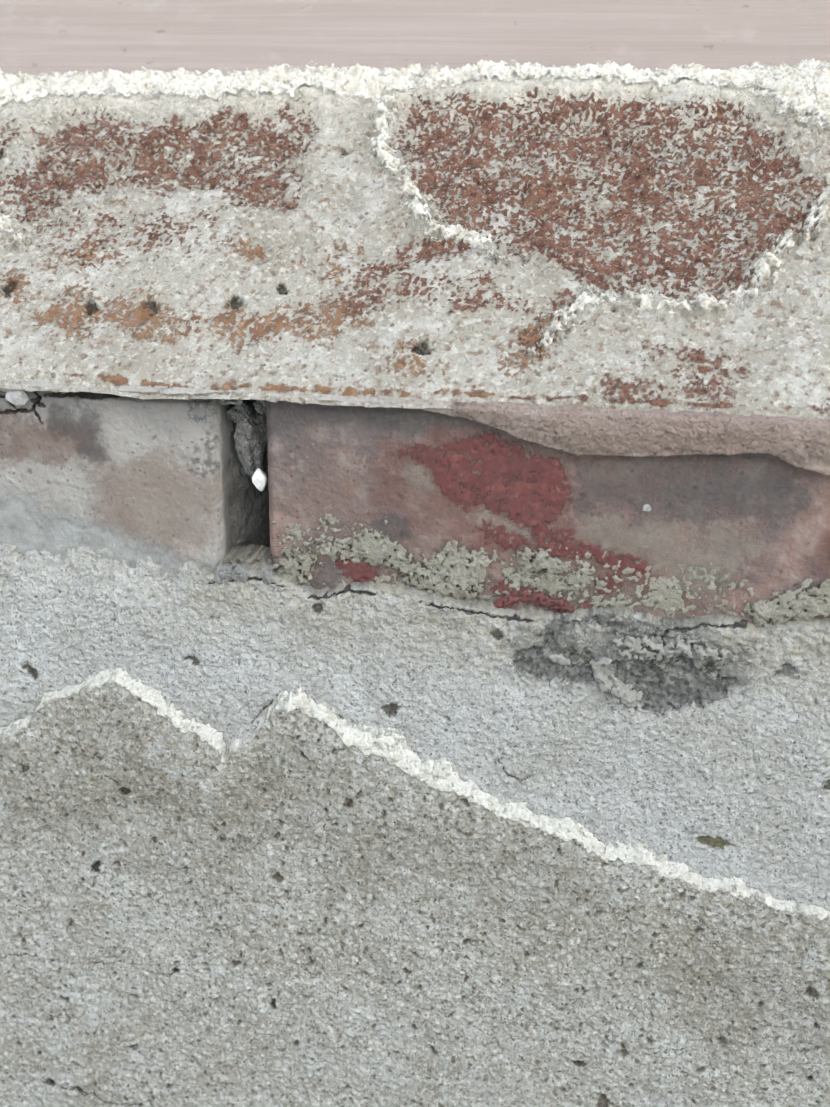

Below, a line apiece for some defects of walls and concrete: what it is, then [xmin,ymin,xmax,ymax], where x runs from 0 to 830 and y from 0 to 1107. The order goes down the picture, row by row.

peeling [0,101,319,268]
peeling [363,87,829,357]
crack [0,391,123,423]
peeling [252,468,268,491]
crack [209,577,284,587]
crack [308,584,376,600]
flaking render [270,432,830,716]
crack [420,601,534,623]
crack [629,619,748,646]
flaking render [0,666,830,920]